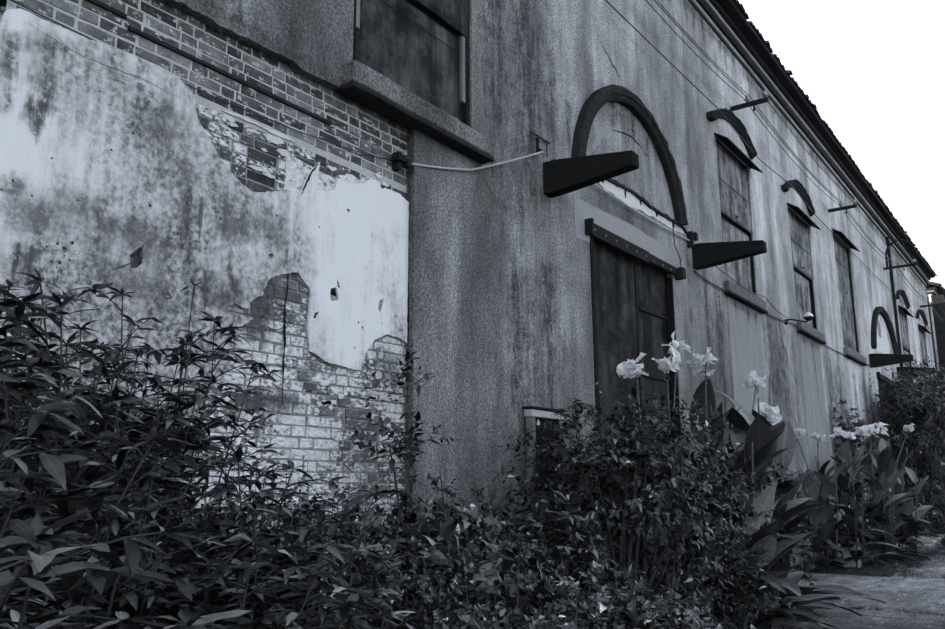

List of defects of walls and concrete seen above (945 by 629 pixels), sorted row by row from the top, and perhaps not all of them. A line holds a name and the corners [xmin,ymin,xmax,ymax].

damp [3,38,17,80]
damp [26,39,66,135]
spalling [0,0,407,214]
damp [12,243,38,278]
damp [9,182,54,228]
damp [115,198,203,261]
damp [202,195,288,341]
spalling [177,273,406,552]